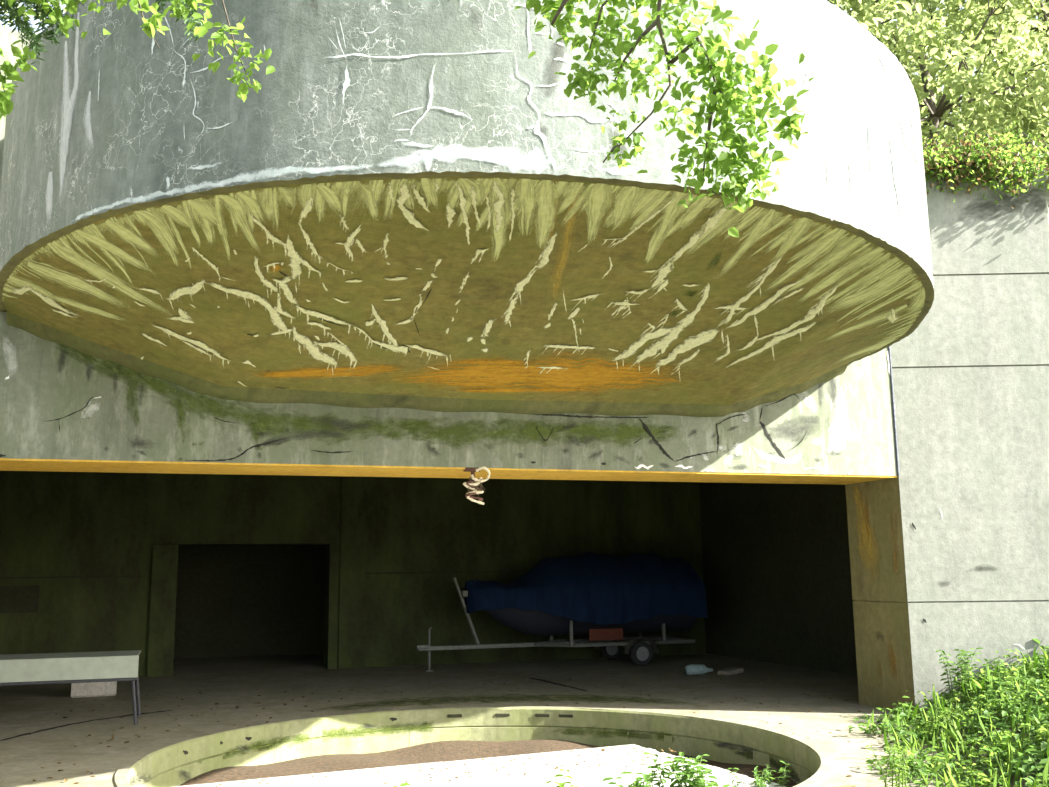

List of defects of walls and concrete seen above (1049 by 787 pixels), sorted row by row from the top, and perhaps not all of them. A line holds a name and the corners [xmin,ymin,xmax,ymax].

crack [165,17,232,140]
crack [328,0,625,170]
water stain [2,142,928,381]
rust [259,358,682,393]
crack [49,396,98,431]
crack [188,438,286,462]
crack [532,394,806,461]
water stain [777,417,818,436]